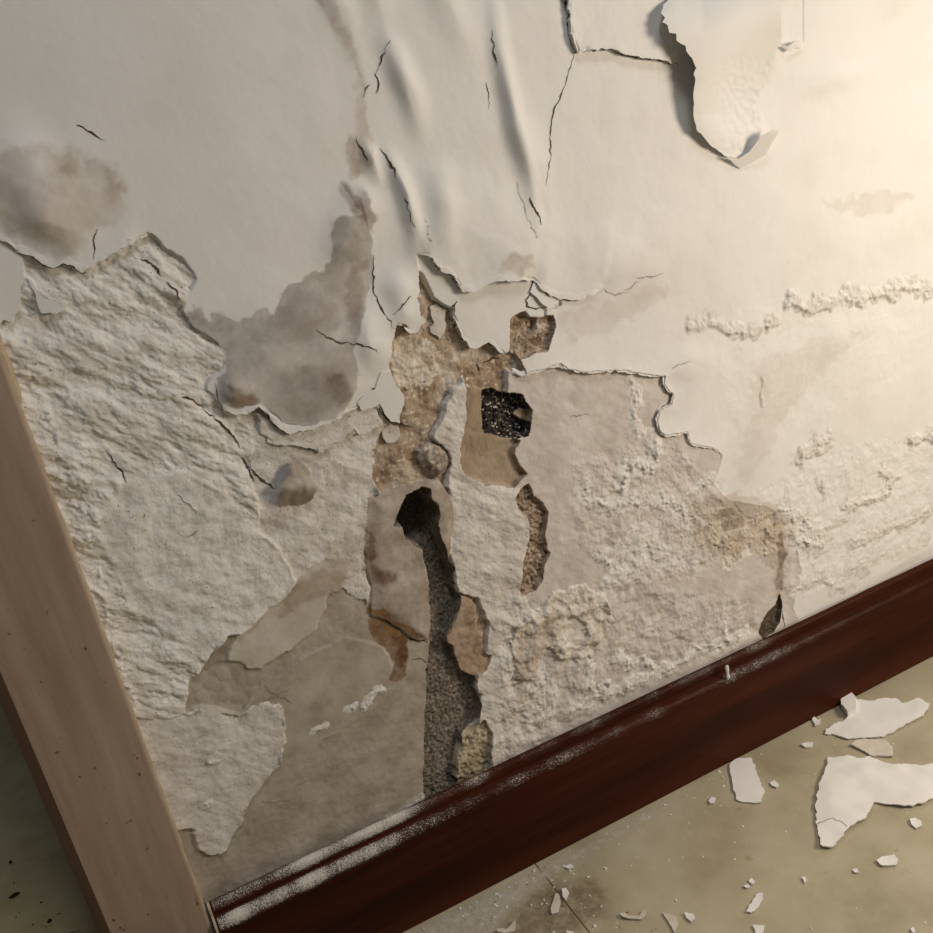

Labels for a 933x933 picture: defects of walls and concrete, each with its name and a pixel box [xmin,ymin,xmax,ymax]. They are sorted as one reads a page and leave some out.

crack [356,138,396,175]
crack [364,40,391,94]
crack [529,57,574,225]
peeling [661,0,805,168]
crack [372,255,412,323]
flaking render [0,232,873,921]